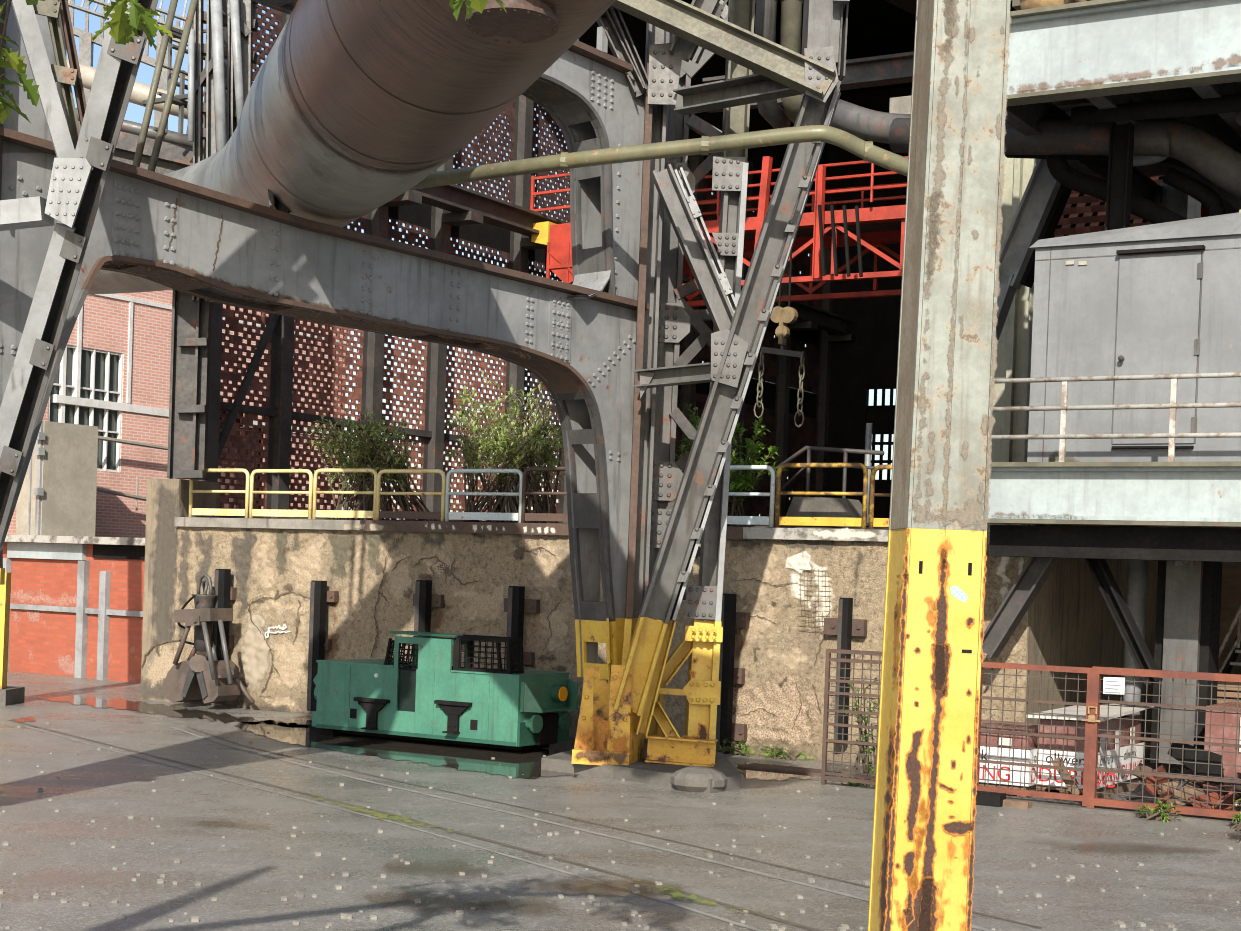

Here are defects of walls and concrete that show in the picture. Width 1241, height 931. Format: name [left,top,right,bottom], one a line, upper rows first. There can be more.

rust [1010,54,1241,93]
peeling [913,0,1012,530]
crack [141,639,179,667]
crack [247,590,310,698]
crack [370,556,479,658]
crack [516,546,555,556]
crack [543,599,562,650]
spalling [724,552,833,752]
rust [966,537,987,663]
rust [576,716,632,765]
rust [683,723,708,740]
rust [879,528,979,931]